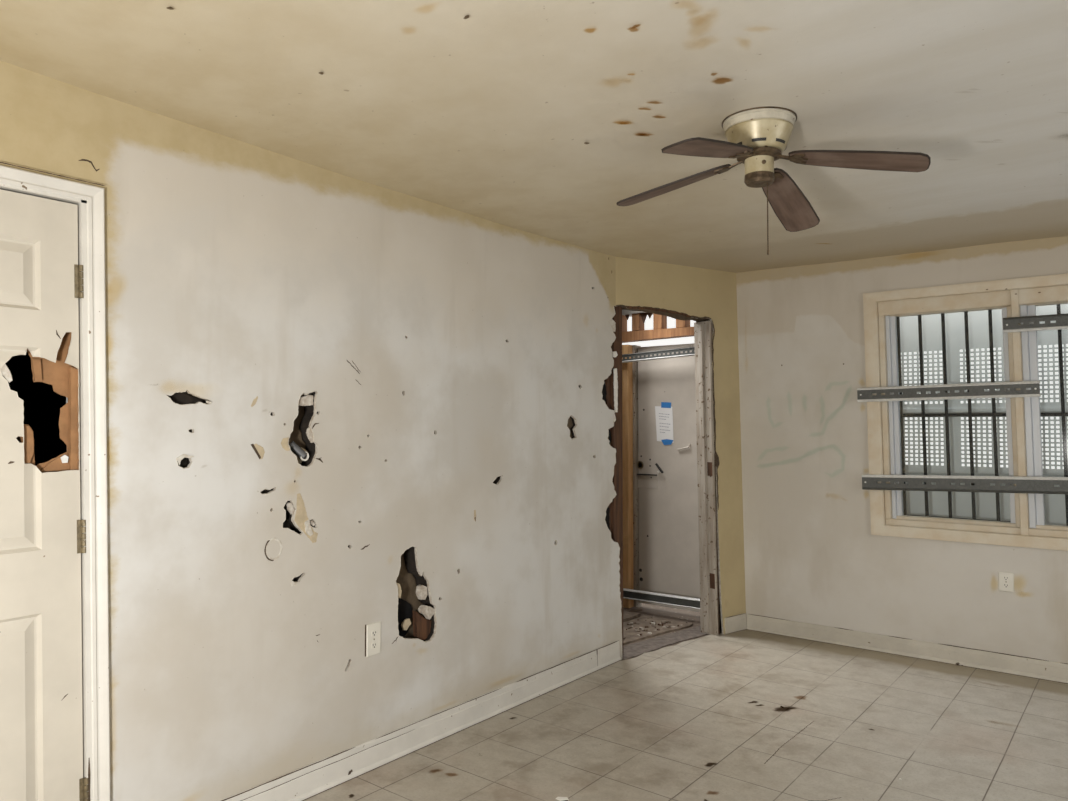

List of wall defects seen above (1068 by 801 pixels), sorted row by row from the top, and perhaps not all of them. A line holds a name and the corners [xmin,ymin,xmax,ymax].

spalling [270,391,320,468]
spalling [270,480,318,543]
spalling [601,305,720,653]
spalling [395,546,442,643]